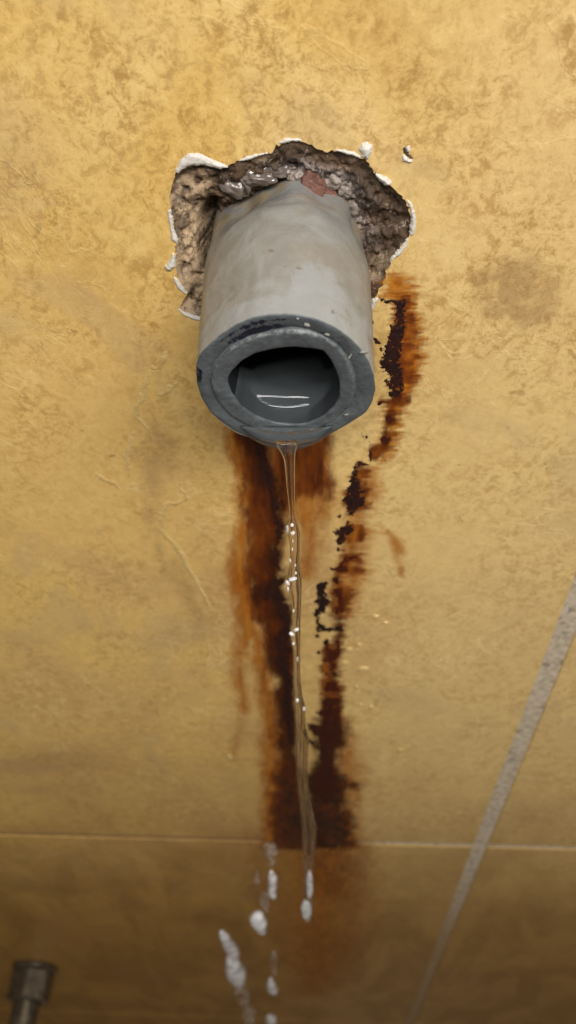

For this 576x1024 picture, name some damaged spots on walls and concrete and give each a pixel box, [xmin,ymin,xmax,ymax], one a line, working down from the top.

spalling [165,138,416,321]
rust [227,273,427,974]